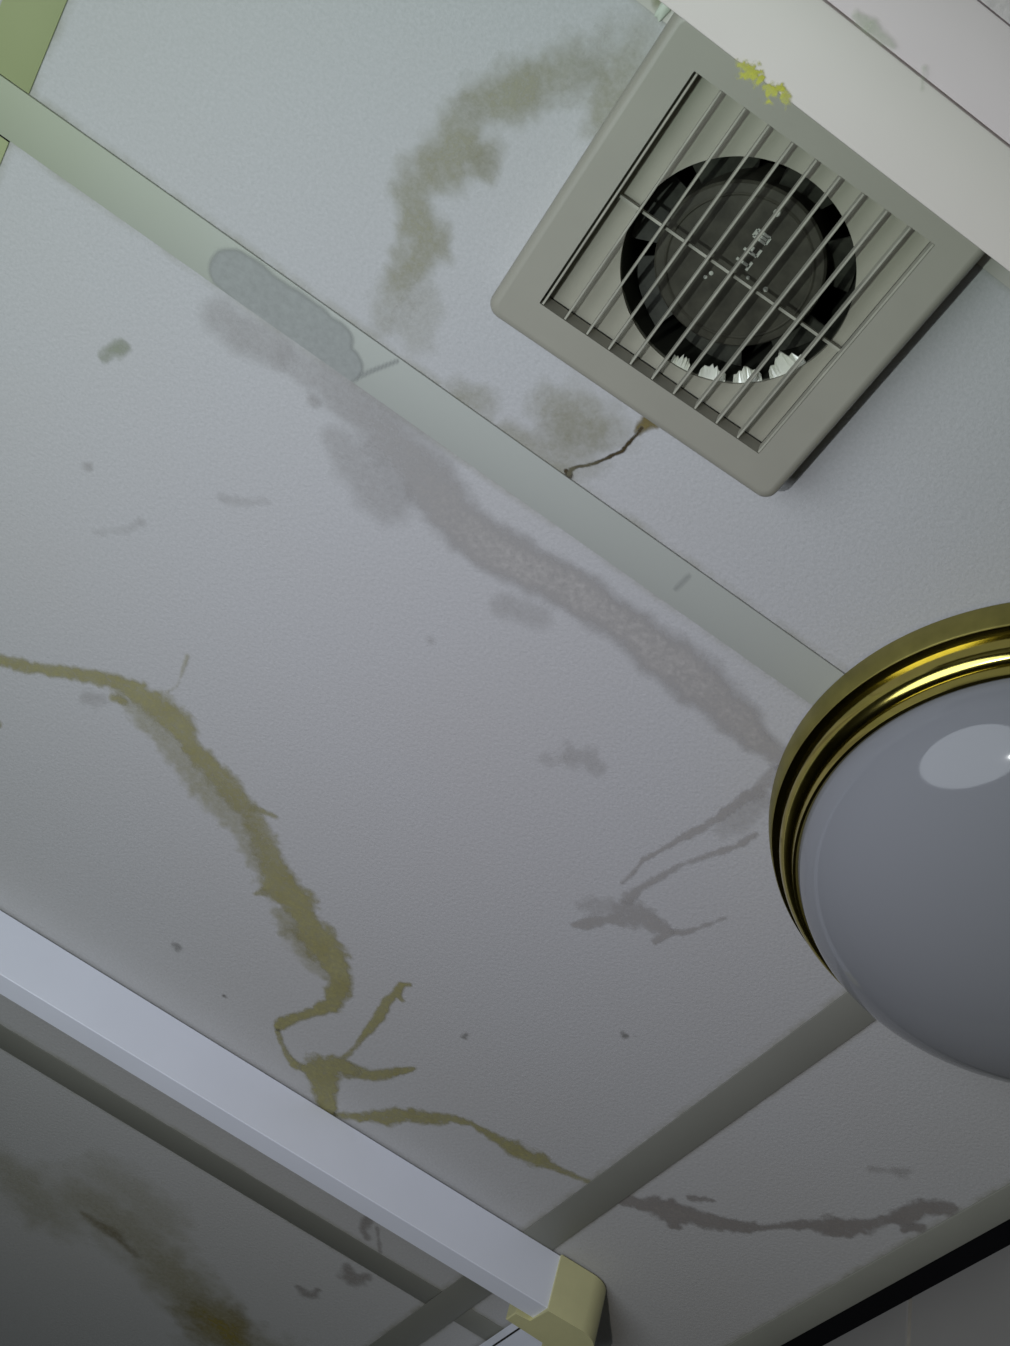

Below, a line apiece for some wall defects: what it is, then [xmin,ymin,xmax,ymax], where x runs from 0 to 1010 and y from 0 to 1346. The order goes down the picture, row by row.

damp [210,250,394,382]
damp [355,402,784,762]
damp [0,656,586,1181]
damp [572,782,765,944]
damp [619,1196,957,1238]